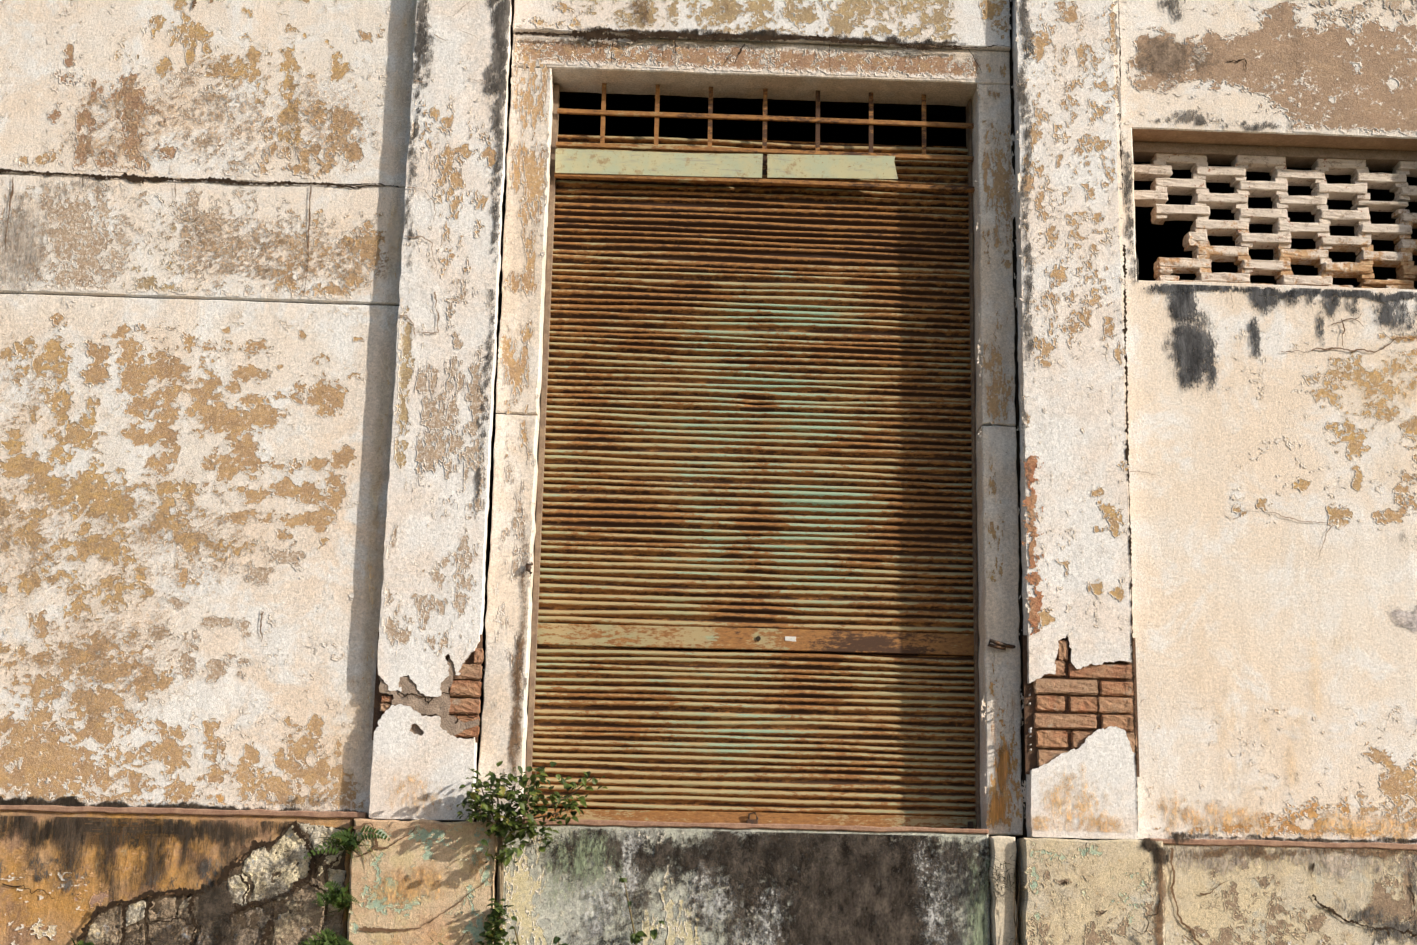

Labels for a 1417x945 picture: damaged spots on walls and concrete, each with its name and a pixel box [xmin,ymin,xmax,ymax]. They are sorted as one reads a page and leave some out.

water stain [0,334,281,734]
peeling [1,0,365,180]
water stain [0,54,390,295]
peeling [0,77,539,812]
flaking render [502,0,1417,428]
flaking render [981,446,1162,835]
water stain [1121,133,1417,393]
crack [1281,312,1417,353]
water stain [0,796,358,945]
water stain [538,828,990,945]
peeling [1025,704,1417,945]
crack [1311,863,1417,937]